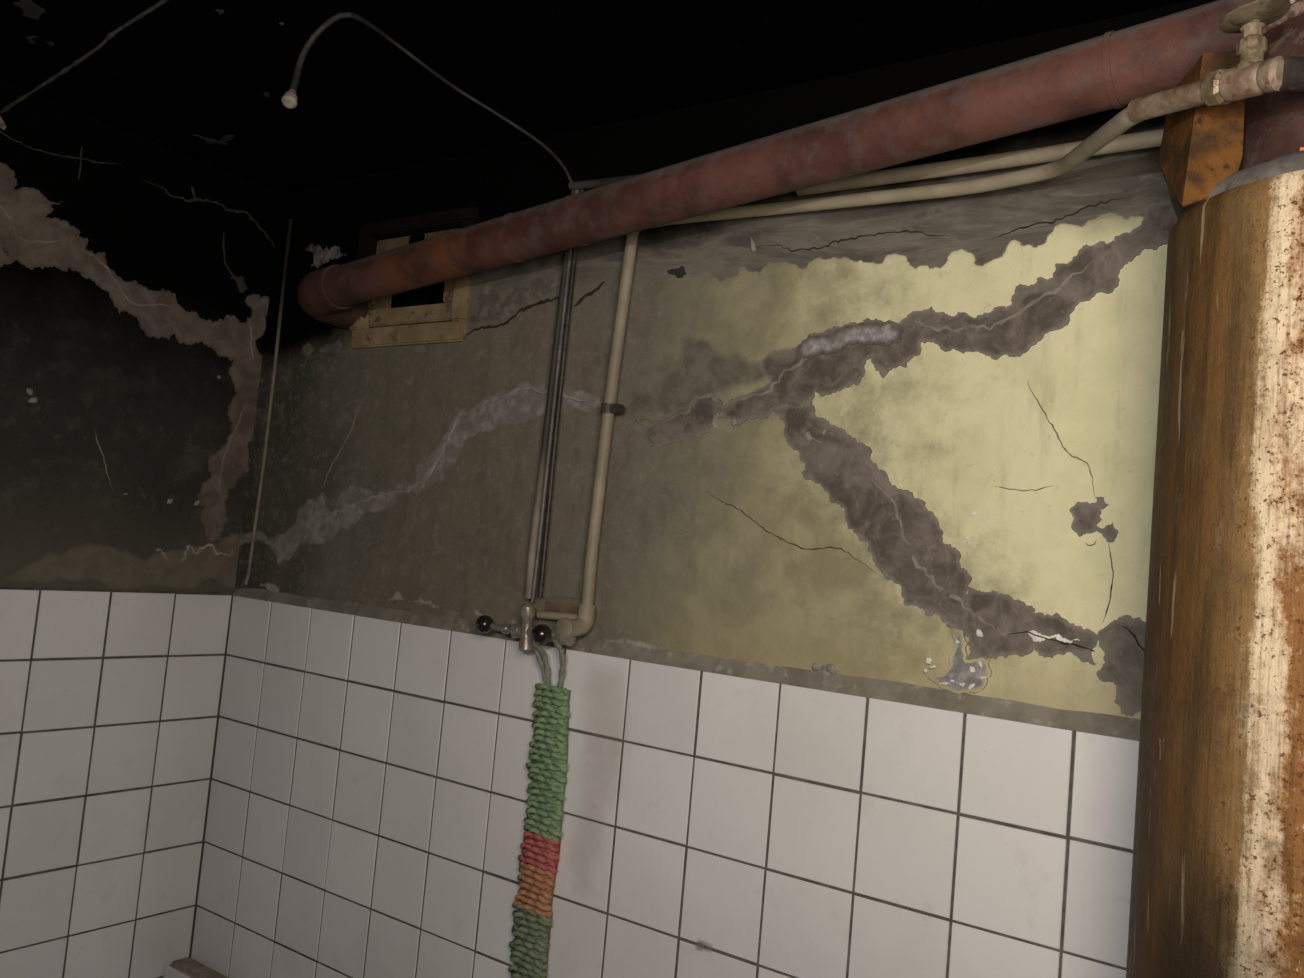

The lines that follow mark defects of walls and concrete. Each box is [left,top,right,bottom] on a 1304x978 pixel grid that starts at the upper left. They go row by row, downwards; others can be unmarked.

crack [465,281,605,335]
peeling [0,163,269,543]
peeling [623,152,1187,716]
crack [996,484,1053,492]
water stain [156,543,233,562]
water stain [924,624,992,694]